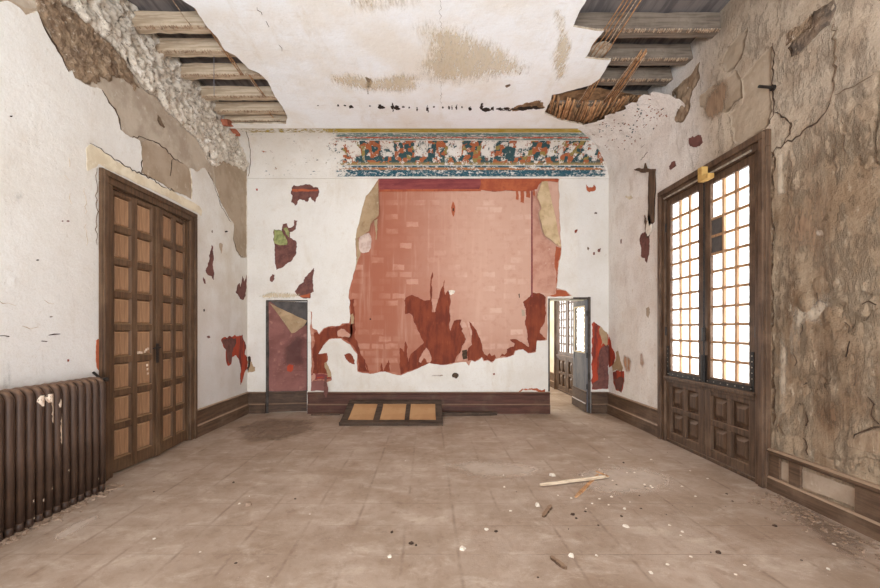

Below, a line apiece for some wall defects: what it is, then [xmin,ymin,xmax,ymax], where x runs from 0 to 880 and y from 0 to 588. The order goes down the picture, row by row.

flaking render [0,0,258,258]
peeling [213,28,773,192]
crack [769,24,874,249]
peeling [291,184,319,205]
peeling [270,220,297,282]
peeling [639,232,650,262]
peeling [295,268,314,299]
peeling [221,335,255,385]
peeling [591,322,624,392]